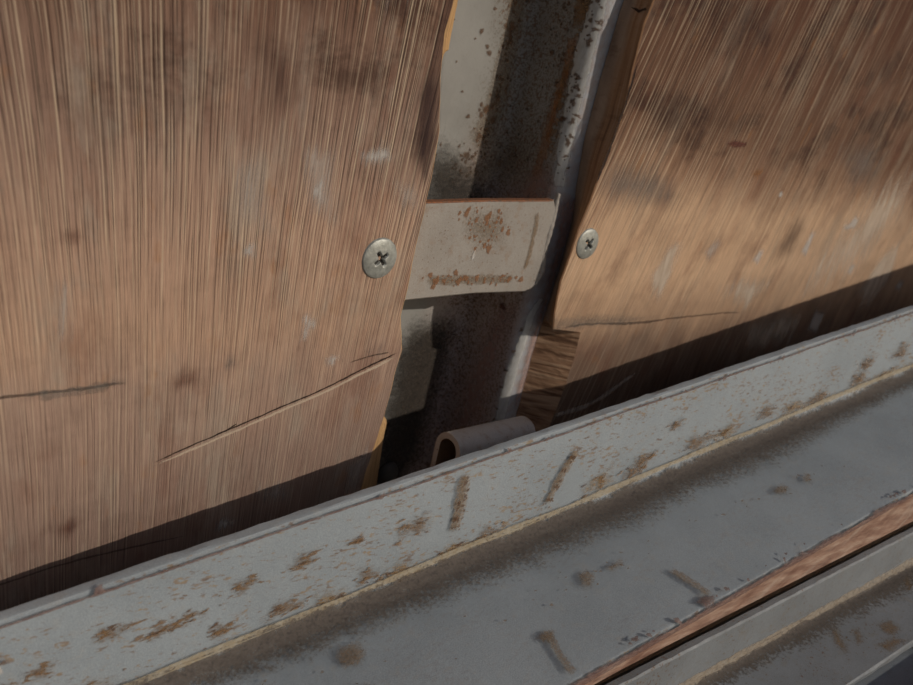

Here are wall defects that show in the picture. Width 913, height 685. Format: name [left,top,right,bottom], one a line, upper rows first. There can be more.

rust [451,0,532,185]
rust [422,214,539,289]
rust [426,198,553,253]
crack [161,355,392,462]
rust [0,312,913,685]